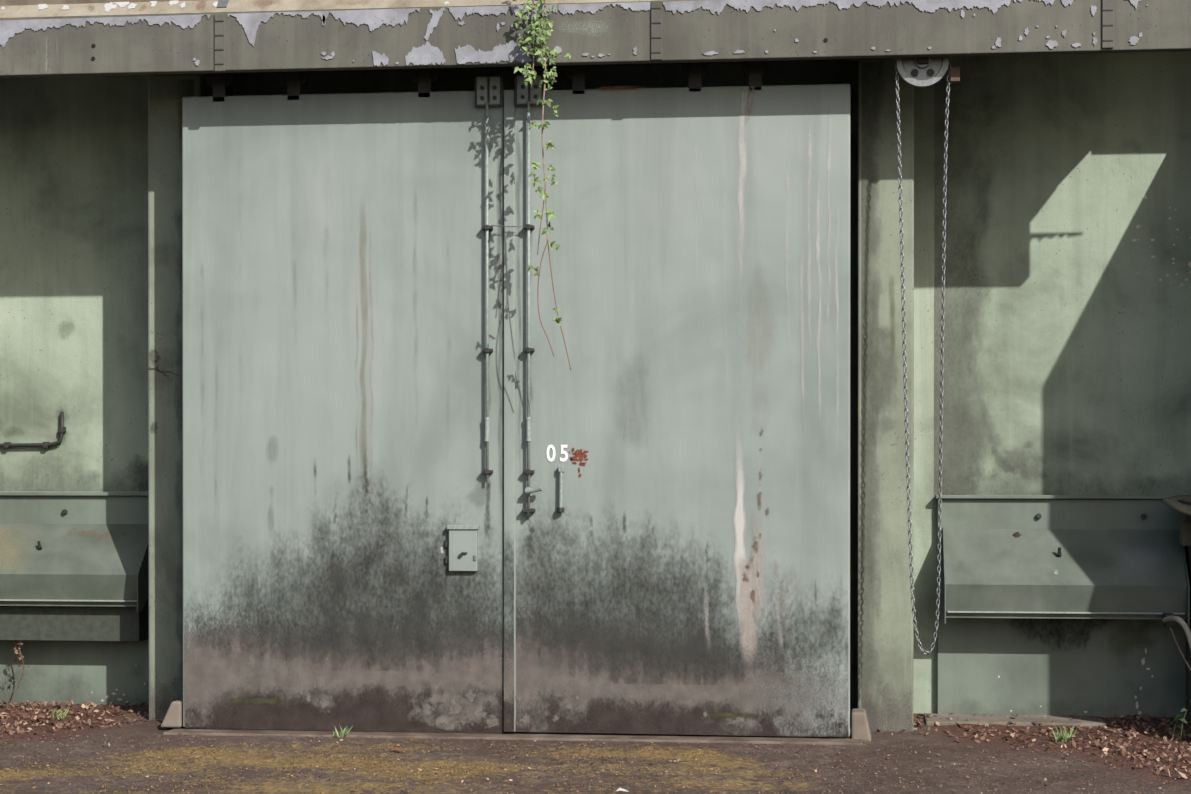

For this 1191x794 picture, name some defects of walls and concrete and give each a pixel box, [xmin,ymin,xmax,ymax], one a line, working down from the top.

peeling [0,0,1073,66]
peeling [1019,25,1097,49]
leakage [861,62,877,259]
crack [149,365,182,379]
leakage [934,288,985,495]
rust [569,448,589,477]
leakage [861,273,913,732]
leakage [243,468,847,732]
rust [743,535,761,601]